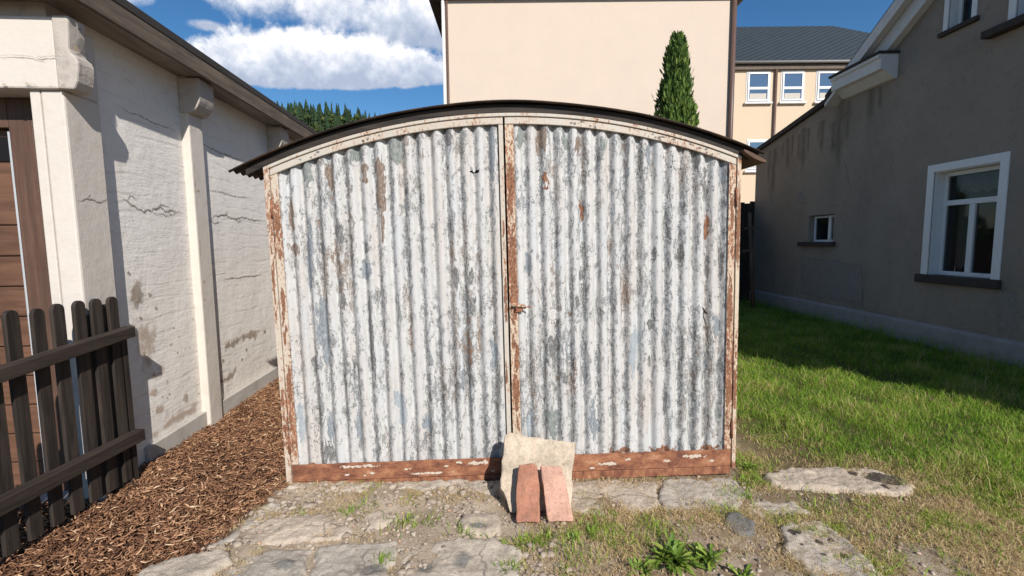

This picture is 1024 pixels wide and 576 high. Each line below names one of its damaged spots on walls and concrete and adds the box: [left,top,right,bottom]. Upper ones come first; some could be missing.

crack [78,195,179,217]
crack [211,190,261,224]
corrosion [271,247,288,345]
peeling [282,198,330,378]
peeling [298,151,335,193]
peeling [349,134,406,380]
corrosion [503,163,520,431]
peeling [516,124,547,156]
peeling [704,241,726,287]
corrosion [730,184,741,264]
corrosion [726,274,736,430]
corrosion [602,445,676,453]